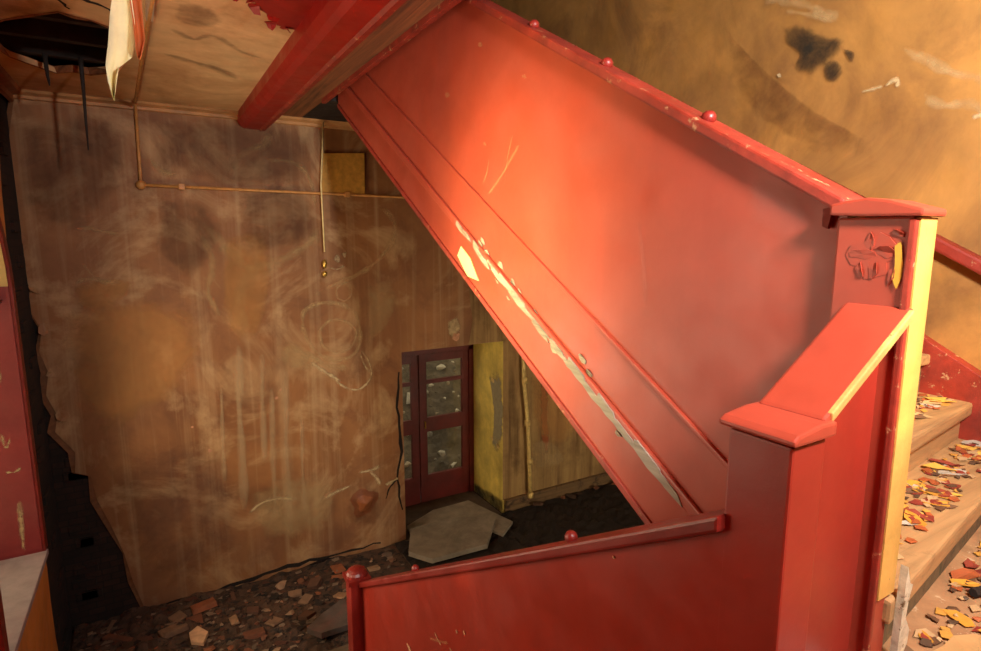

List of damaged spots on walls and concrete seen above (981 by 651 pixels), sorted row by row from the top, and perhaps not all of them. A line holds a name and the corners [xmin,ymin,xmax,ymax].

crack [58,0,110,11]
peeling [233,0,316,33]
peeling [105,0,145,101]
damp [789,30,853,80]
peeling [456,221,683,507]